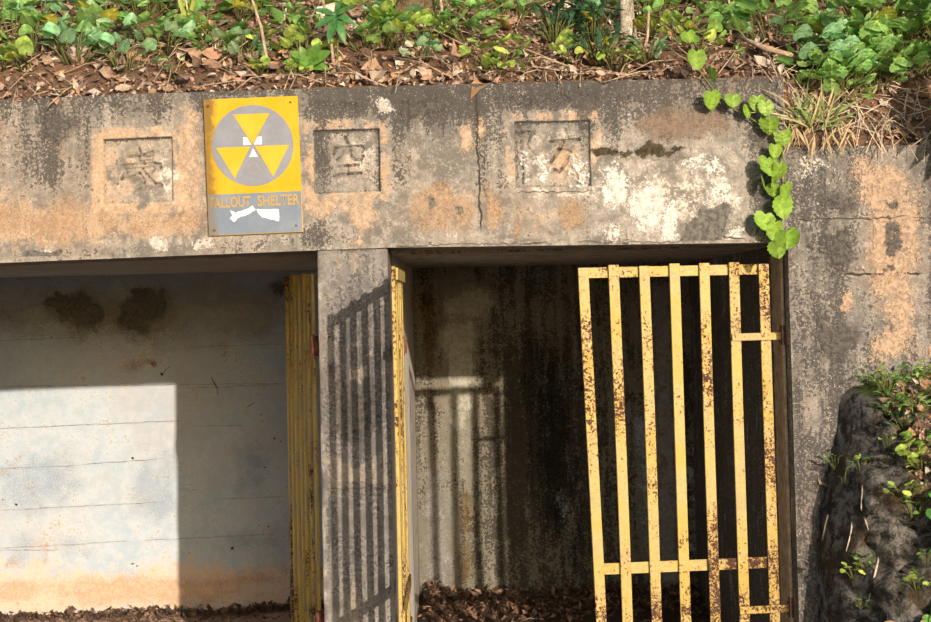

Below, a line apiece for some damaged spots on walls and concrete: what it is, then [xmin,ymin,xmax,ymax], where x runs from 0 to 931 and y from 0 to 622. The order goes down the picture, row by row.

crack [338,92,550,251]
crack [517,188,595,196]
leakage [0,288,271,338]
leakage [422,469,454,587]
leakage [438,283,499,478]
leakage [515,328,585,575]